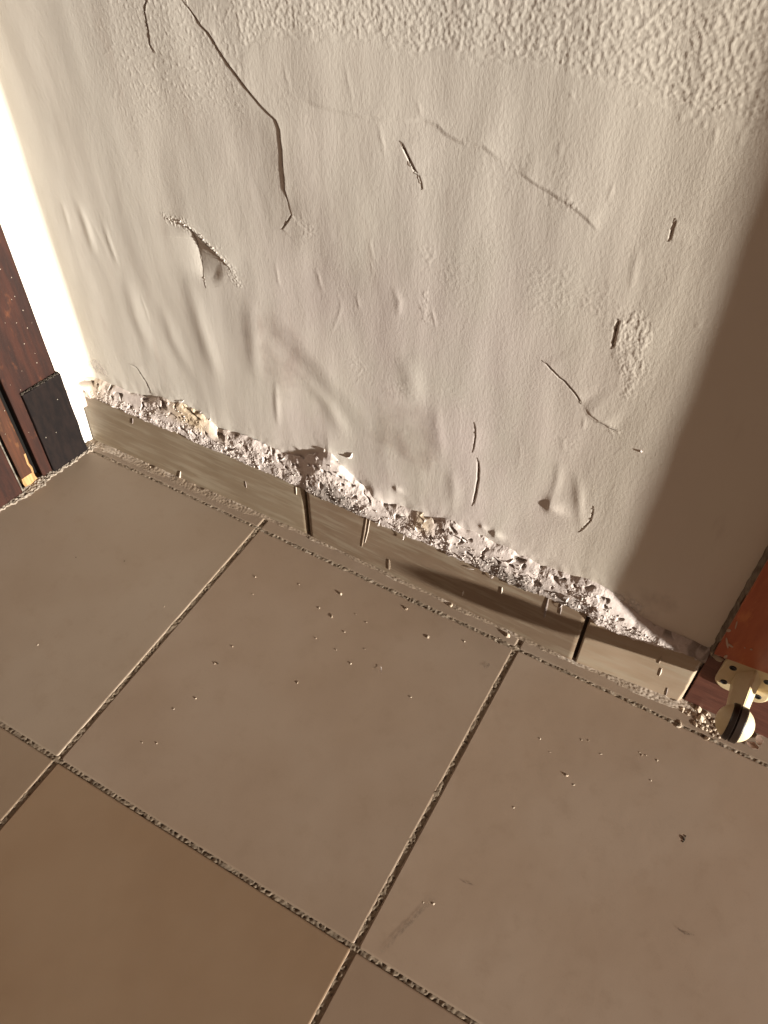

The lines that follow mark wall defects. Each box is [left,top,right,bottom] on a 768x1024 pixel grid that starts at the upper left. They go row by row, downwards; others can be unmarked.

crack [141,0,157,58]
crack [179,0,296,234]
crack [396,135,426,195]
flaking render [160,211,243,301]
crack [664,213,682,247]
crack [537,355,622,435]
crack [469,419,483,509]
flaking render [65,377,710,667]